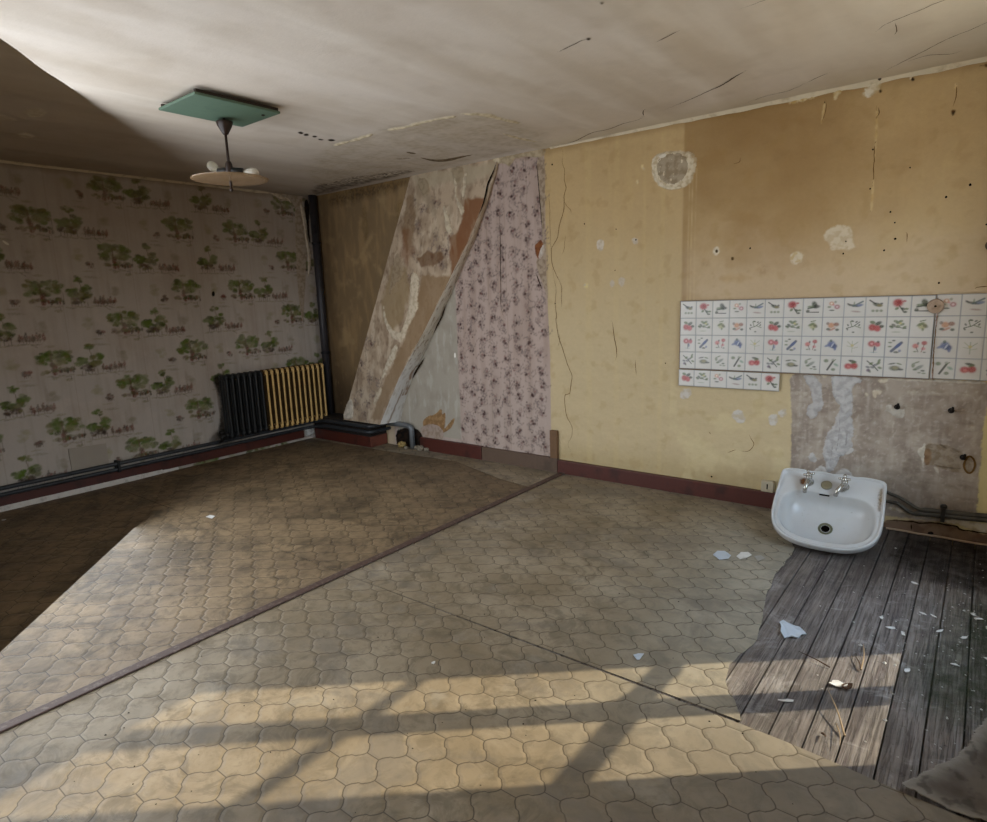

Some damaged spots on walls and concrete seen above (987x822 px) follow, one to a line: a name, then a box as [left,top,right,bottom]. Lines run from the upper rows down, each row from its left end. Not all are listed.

peeling [822,223,857,252]
crack [549,110,644,449]
flaking render [917,443,976,475]